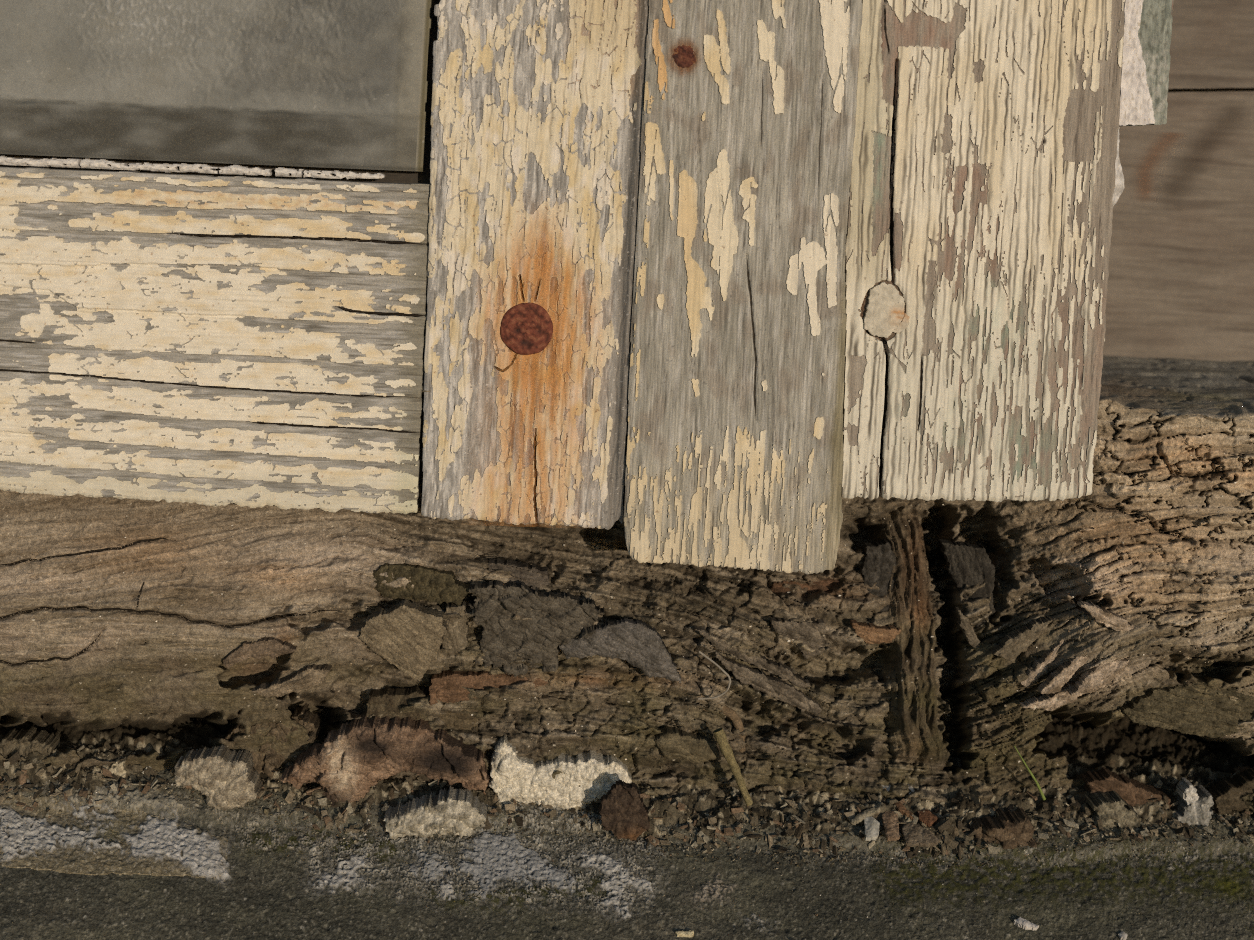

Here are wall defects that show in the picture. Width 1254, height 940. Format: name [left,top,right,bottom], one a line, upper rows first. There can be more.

peeling [0,0,758,529]
peeling [624,417,827,573]
peeling [757,0,786,114]
peeling [786,0,1155,502]